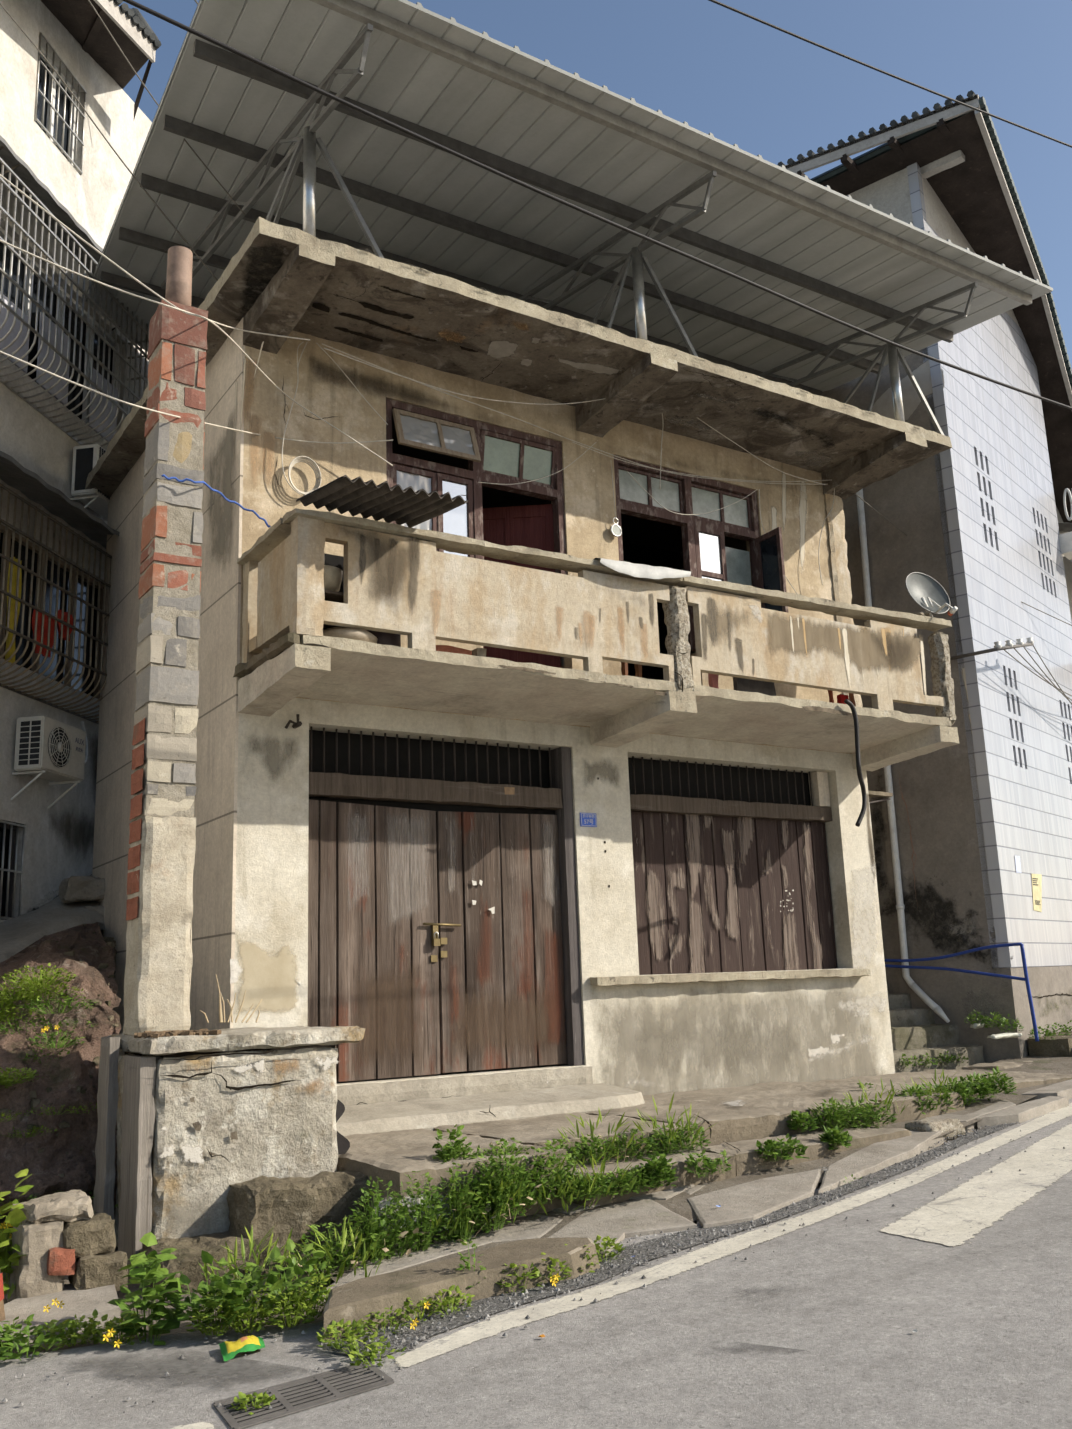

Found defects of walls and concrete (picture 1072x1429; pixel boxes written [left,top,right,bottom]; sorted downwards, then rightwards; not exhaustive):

damp [209,342,264,558]
damp [701,598,927,696]
peeling [636,814,822,974]
damp [852,776,996,969]
peeling [233,1058,265,1076]
crack [160,1044,341,1091]
peeling [315,1056,338,1071]
peeling [160,1121,218,1168]